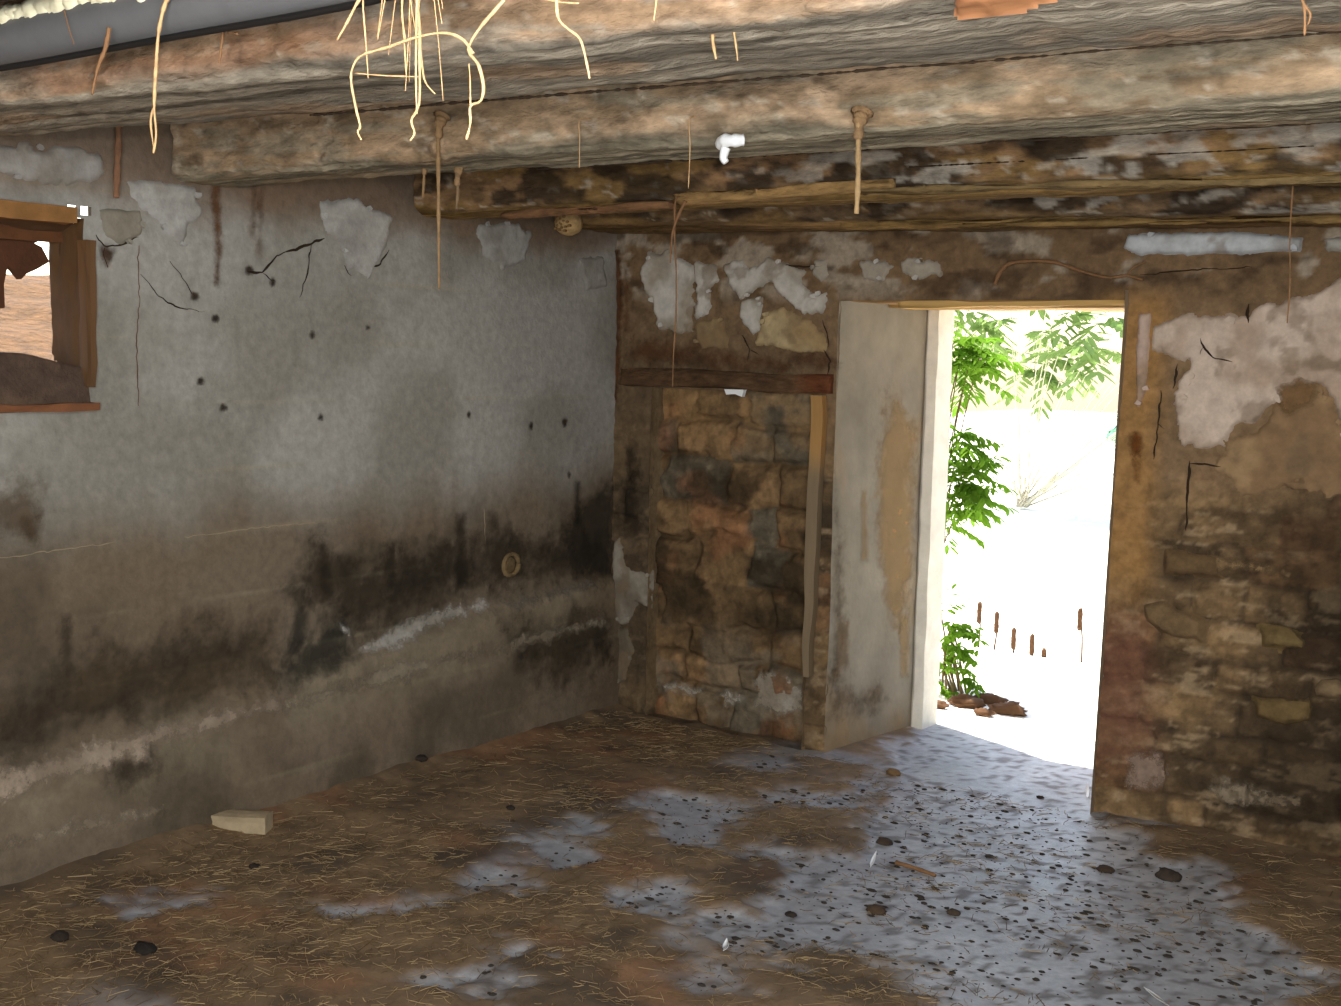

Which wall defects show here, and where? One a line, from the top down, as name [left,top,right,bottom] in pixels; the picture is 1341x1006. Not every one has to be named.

peeling [0,142,105,186]
crack [96,235,199,406]
peeling [99,180,203,263]
crack [247,238,325,295]
peeling [320,198,393,279]
peeling [476,221,532,270]
peeling [640,249,829,353]
crack [1153,338,1232,460]
peeling [1134,277,1341,449]
crack [1185,461,1220,530]
water stain [0,474,638,798]
peeling [612,538,654,683]